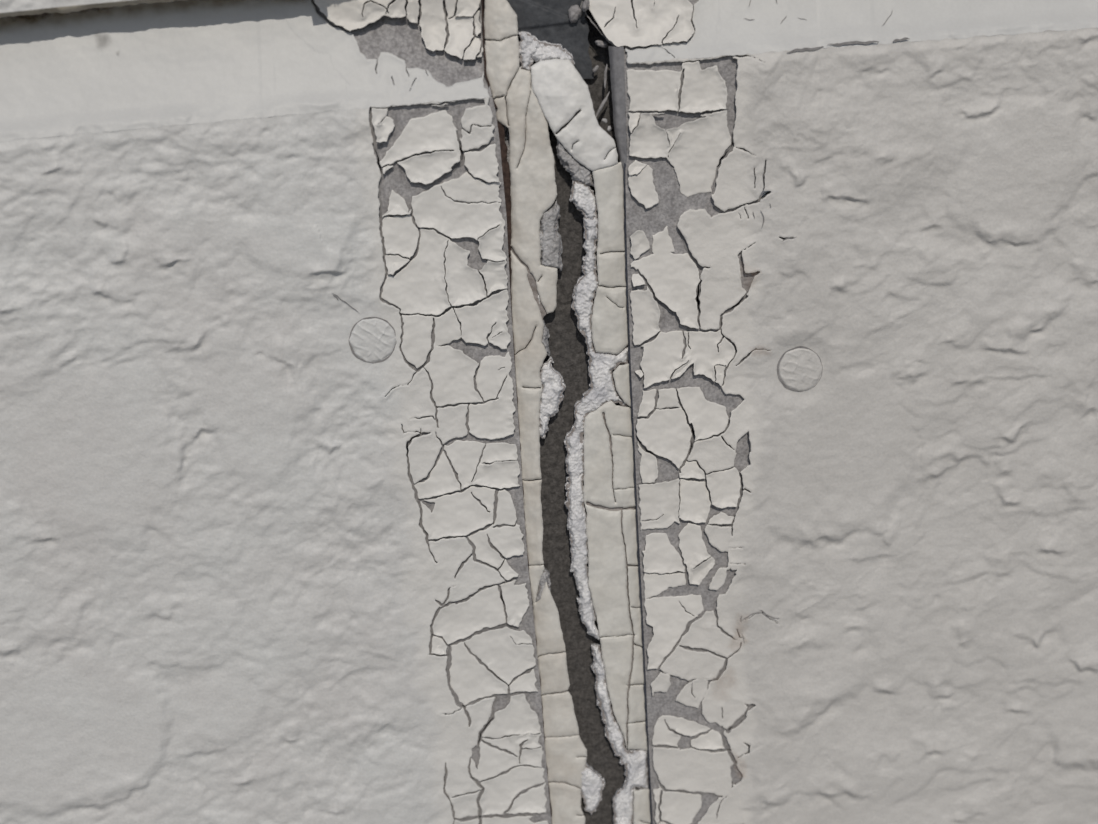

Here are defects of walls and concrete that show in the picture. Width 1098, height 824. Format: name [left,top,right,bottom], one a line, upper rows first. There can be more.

peeling [311,0,552,824]
crack [481,0,653,824]
peeling [581,0,766,824]